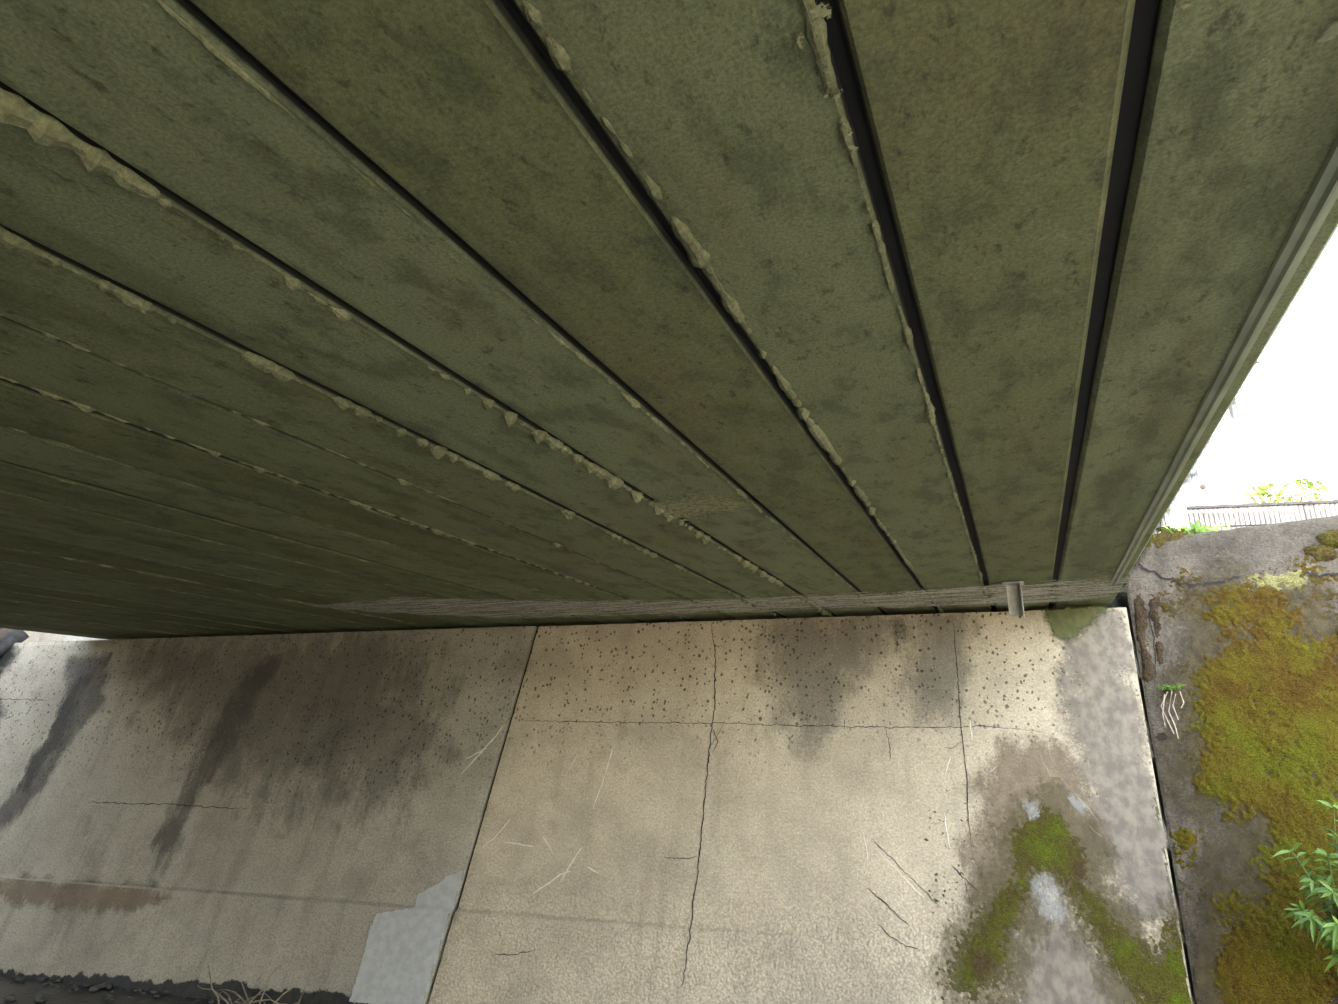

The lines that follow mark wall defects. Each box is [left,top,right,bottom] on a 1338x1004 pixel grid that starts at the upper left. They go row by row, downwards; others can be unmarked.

peeling [796,3,832,49]
damp [306,576,1177,923]
crack [518,625,1041,985]